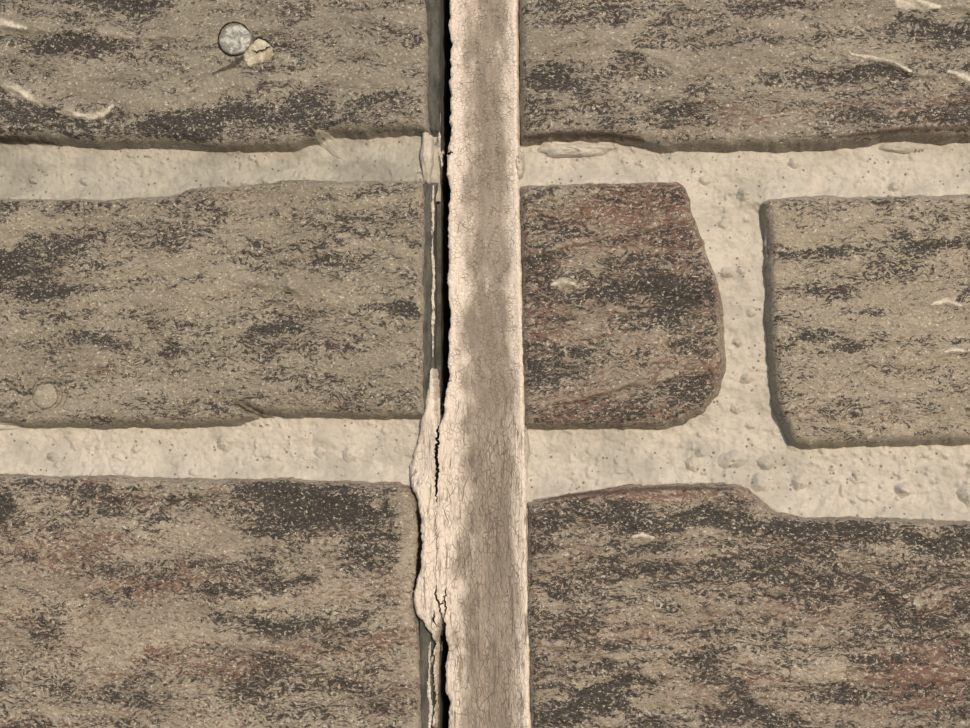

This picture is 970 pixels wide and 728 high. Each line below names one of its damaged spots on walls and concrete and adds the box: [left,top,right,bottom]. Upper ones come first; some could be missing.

crack [447,1,515,296]
crack [412,348,525,728]